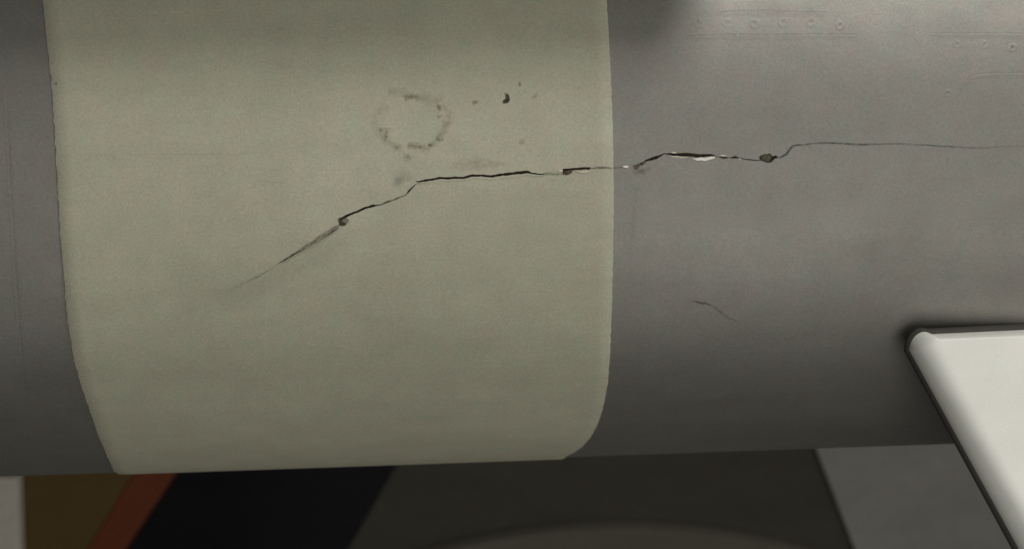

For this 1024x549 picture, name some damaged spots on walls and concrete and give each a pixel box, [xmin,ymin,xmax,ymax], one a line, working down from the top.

crack [281,142,867,263]